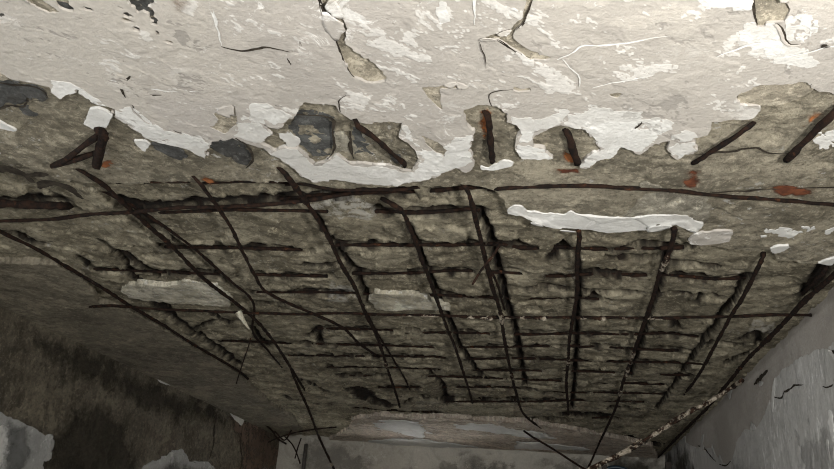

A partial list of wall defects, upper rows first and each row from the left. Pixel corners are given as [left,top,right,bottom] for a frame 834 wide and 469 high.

spalling [123,0,159,33]
flaking render [318,0,386,81]
peeling [698,0,820,69]
rust [480,109,496,164]
rust [783,108,834,163]
spalling [0,80,834,440]
rust [0,118,834,469]
flaking render [0,306,280,469]
water stain [33,340,279,469]
crack [754,369,768,385]
crack [774,384,801,399]
water stain [0,423,30,469]